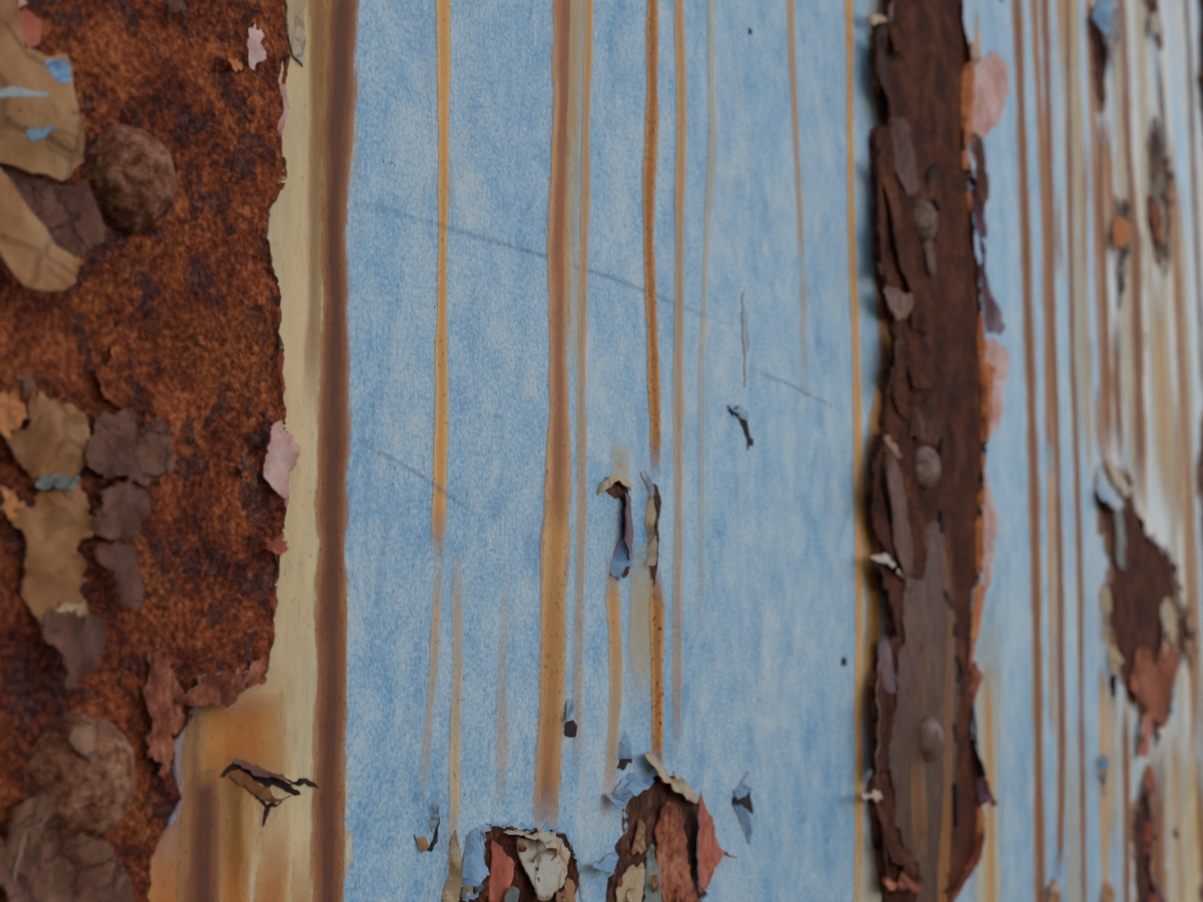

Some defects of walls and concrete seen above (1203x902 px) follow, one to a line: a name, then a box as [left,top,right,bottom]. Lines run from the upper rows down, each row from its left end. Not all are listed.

peeling [0,0,106,291]
peeling [0,788,136,902]
corrosion [0,341,176,689]
corrosion [140,0,359,902]
corrosion [535,0,594,805]
peeling [414,732,737,902]
peeling [597,470,662,587]
corrosion [643,0,687,454]
corrosion [845,0,965,902]
peeling [1086,0,1121,117]
corrosion [1012,0,1203,902]
peeling [1095,458,1199,902]